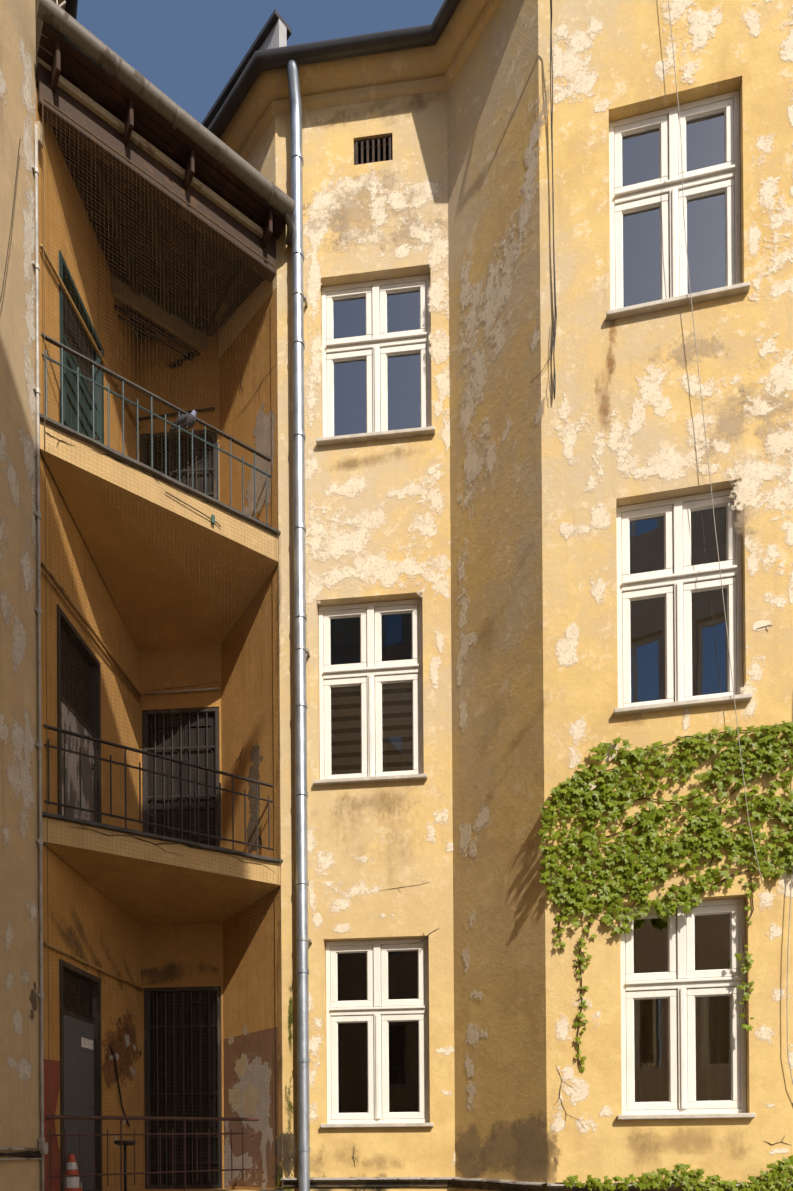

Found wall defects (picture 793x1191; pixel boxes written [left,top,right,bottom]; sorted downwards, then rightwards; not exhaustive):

peeling [740,0,772,37]
peeling [779,6,793,62]
peeling [752,133,775,164]
peeling [748,171,793,301]
peeling [303,17,612,689]
peeling [534,333,793,631]
peeling [740,645,765,717]
peeling [568,716,590,768]
peeling [426,801,489,857]
peeling [555,1014,571,1041]
peeling [223,1025,298,1190]
peeling [514,1066,613,1182]